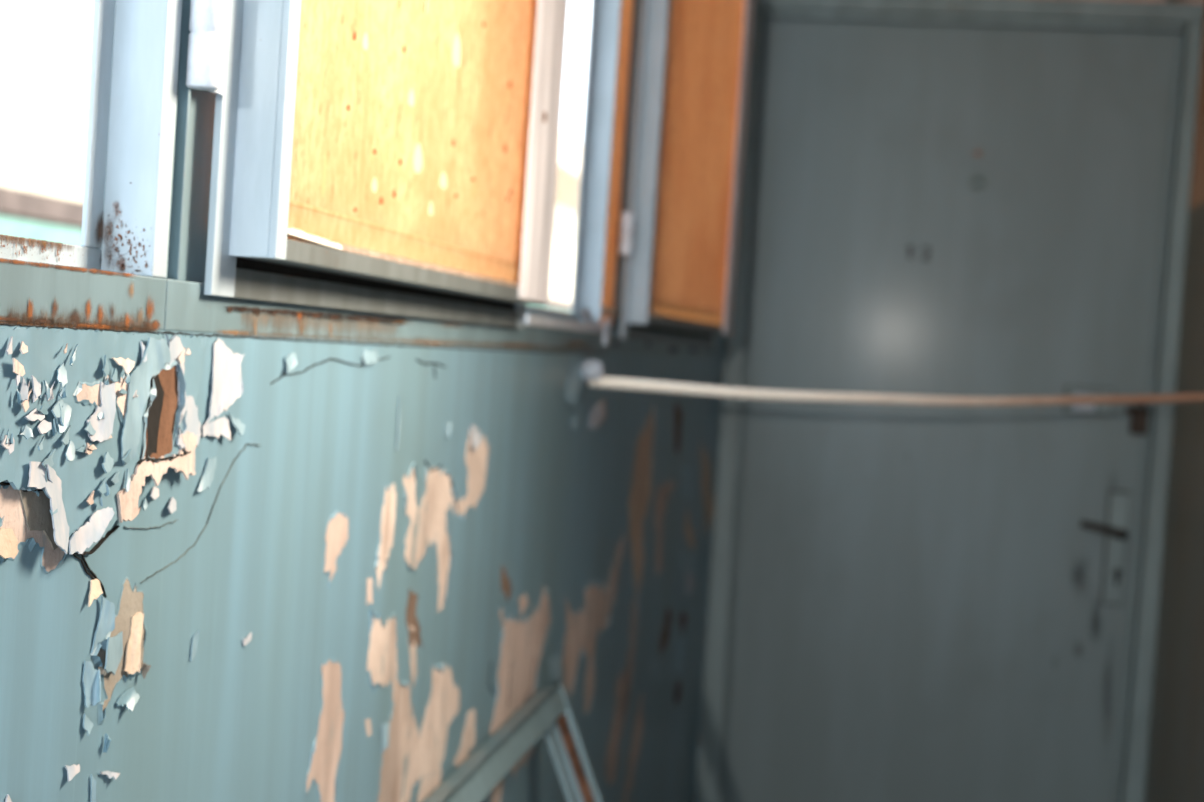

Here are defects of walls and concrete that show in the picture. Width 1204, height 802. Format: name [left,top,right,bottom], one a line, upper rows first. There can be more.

rust [0,204,150,293]
rust [0,301,159,332]
crack [0,324,605,384]
peeling [0,334,245,753]
crack [72,443,260,583]
peeling [323,509,349,587]
peeling [365,401,676,802]
peeling [305,657,345,802]
peeling [65,764,120,802]